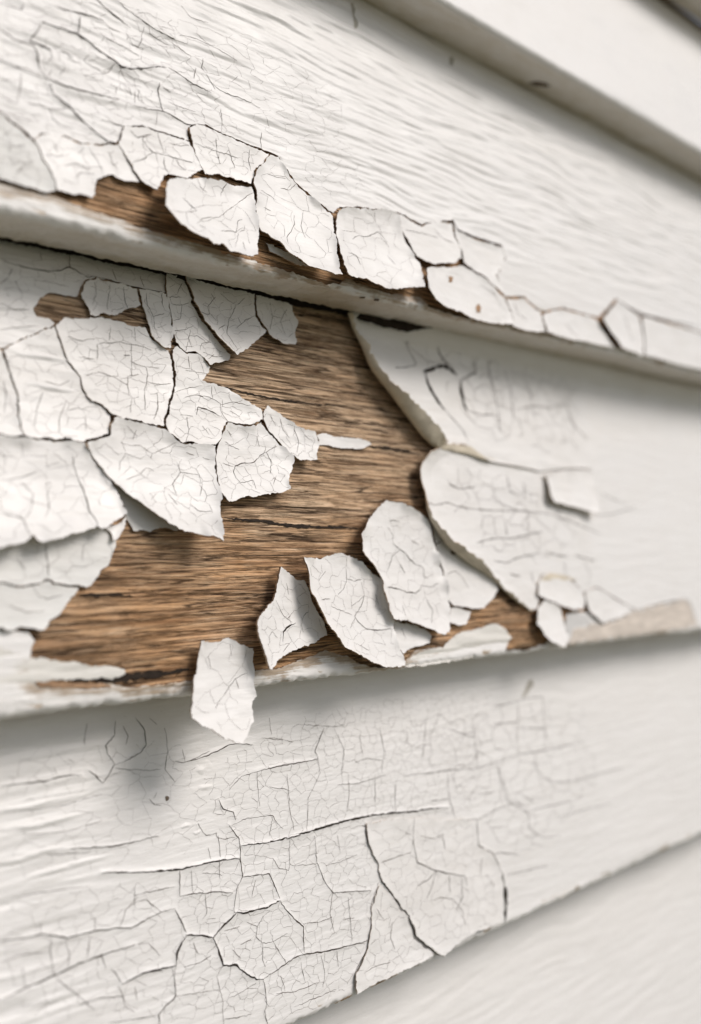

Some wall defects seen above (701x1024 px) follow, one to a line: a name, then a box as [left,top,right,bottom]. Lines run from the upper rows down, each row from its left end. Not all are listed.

crack [0,0,501,283]
peeling [0,113,701,370]
peeling [0,273,634,743]
crack [1,507,619,1024]